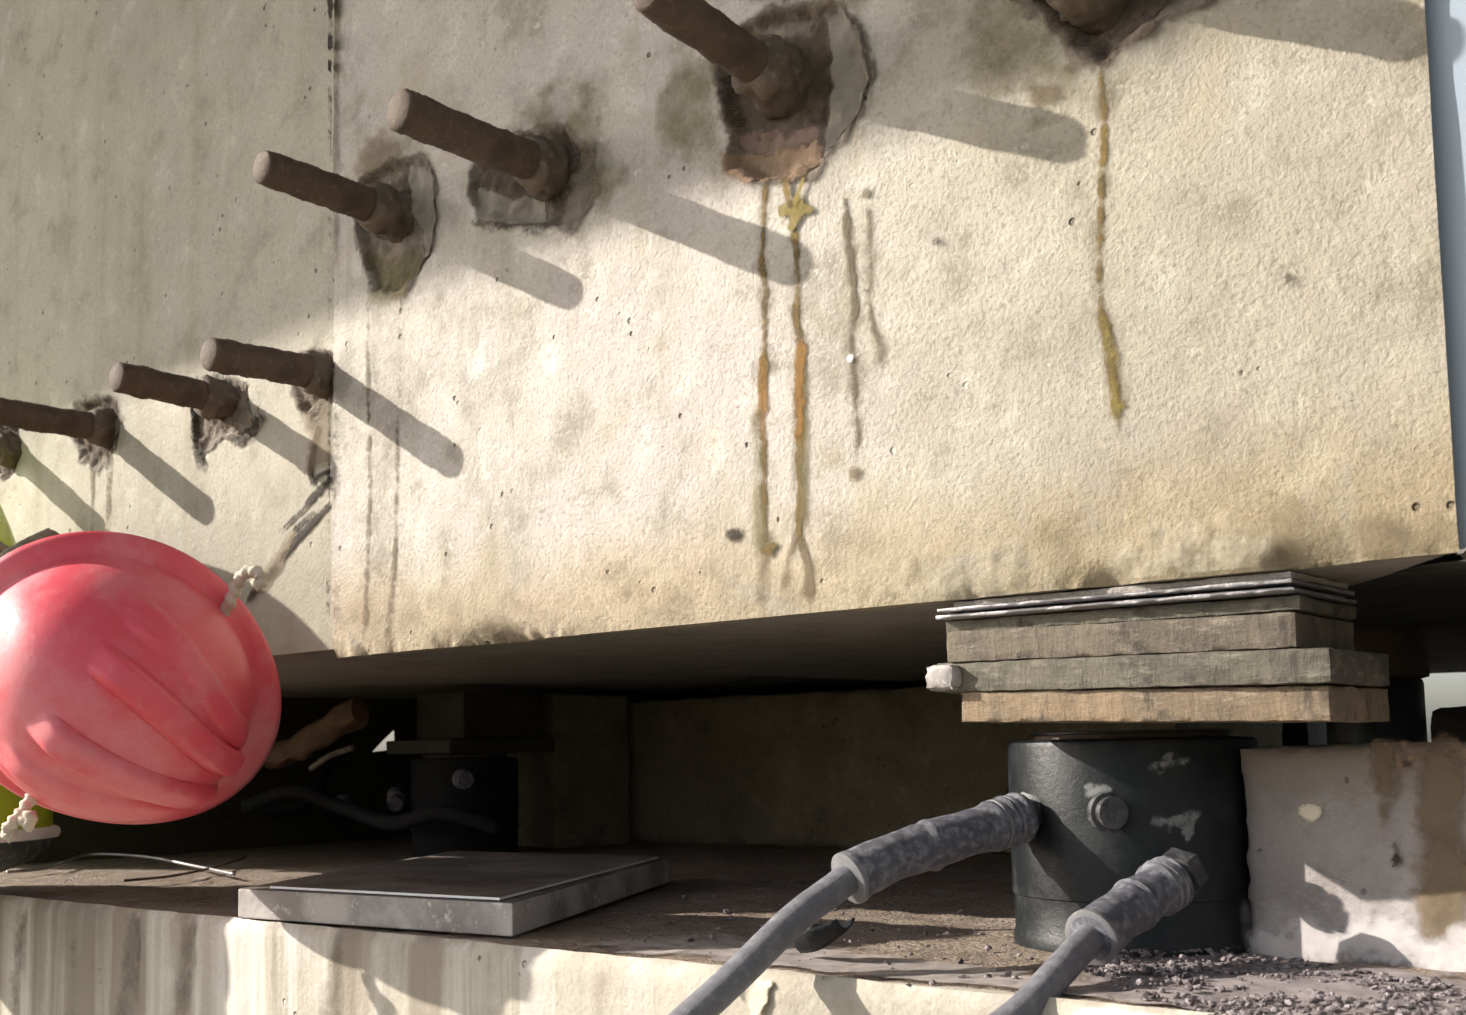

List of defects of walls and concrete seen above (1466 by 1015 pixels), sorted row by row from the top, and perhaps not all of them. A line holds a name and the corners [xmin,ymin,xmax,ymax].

crack [327,0,339,141]
spalling [353,140,437,300]
spalling [466,86,610,234]
spalling [668,0,875,184]
rust [1096,63,1125,425]
spalling [1014,0,1215,70]
rust [753,168,814,597]
crack [247,412,332,603]
damp [1250,740,1466,972]